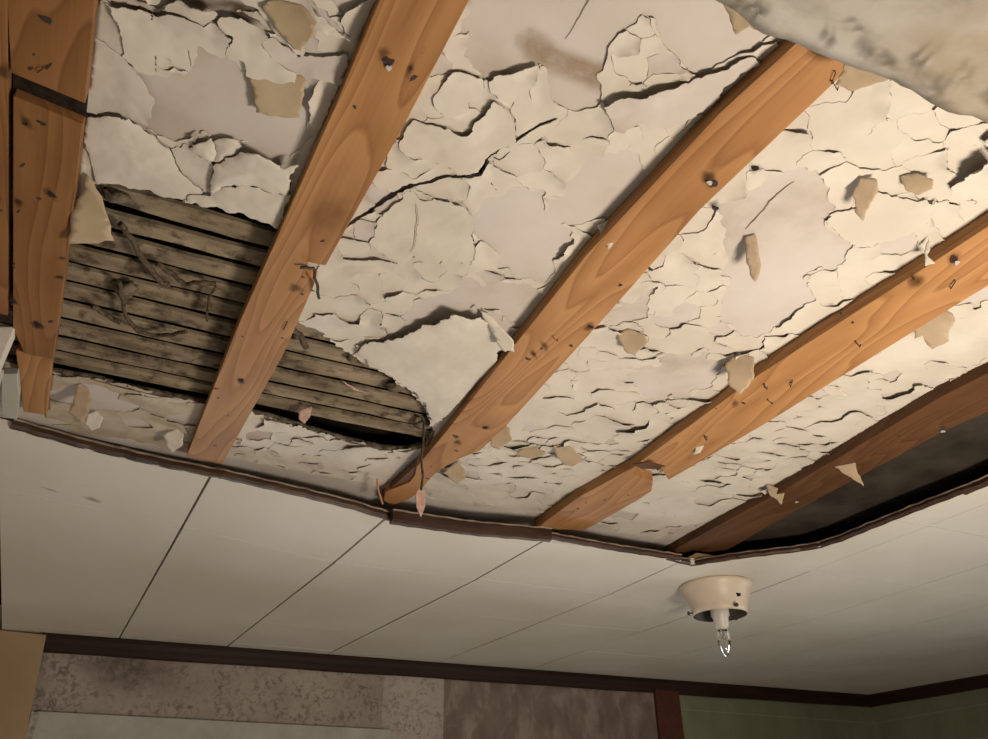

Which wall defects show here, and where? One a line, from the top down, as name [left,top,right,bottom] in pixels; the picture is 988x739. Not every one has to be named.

peeling [68,0,376,244]
crack [347,118,556,252]
peeling [226,0,783,485]
leakage [566,58,602,86]
peeling [423,78,988,539]